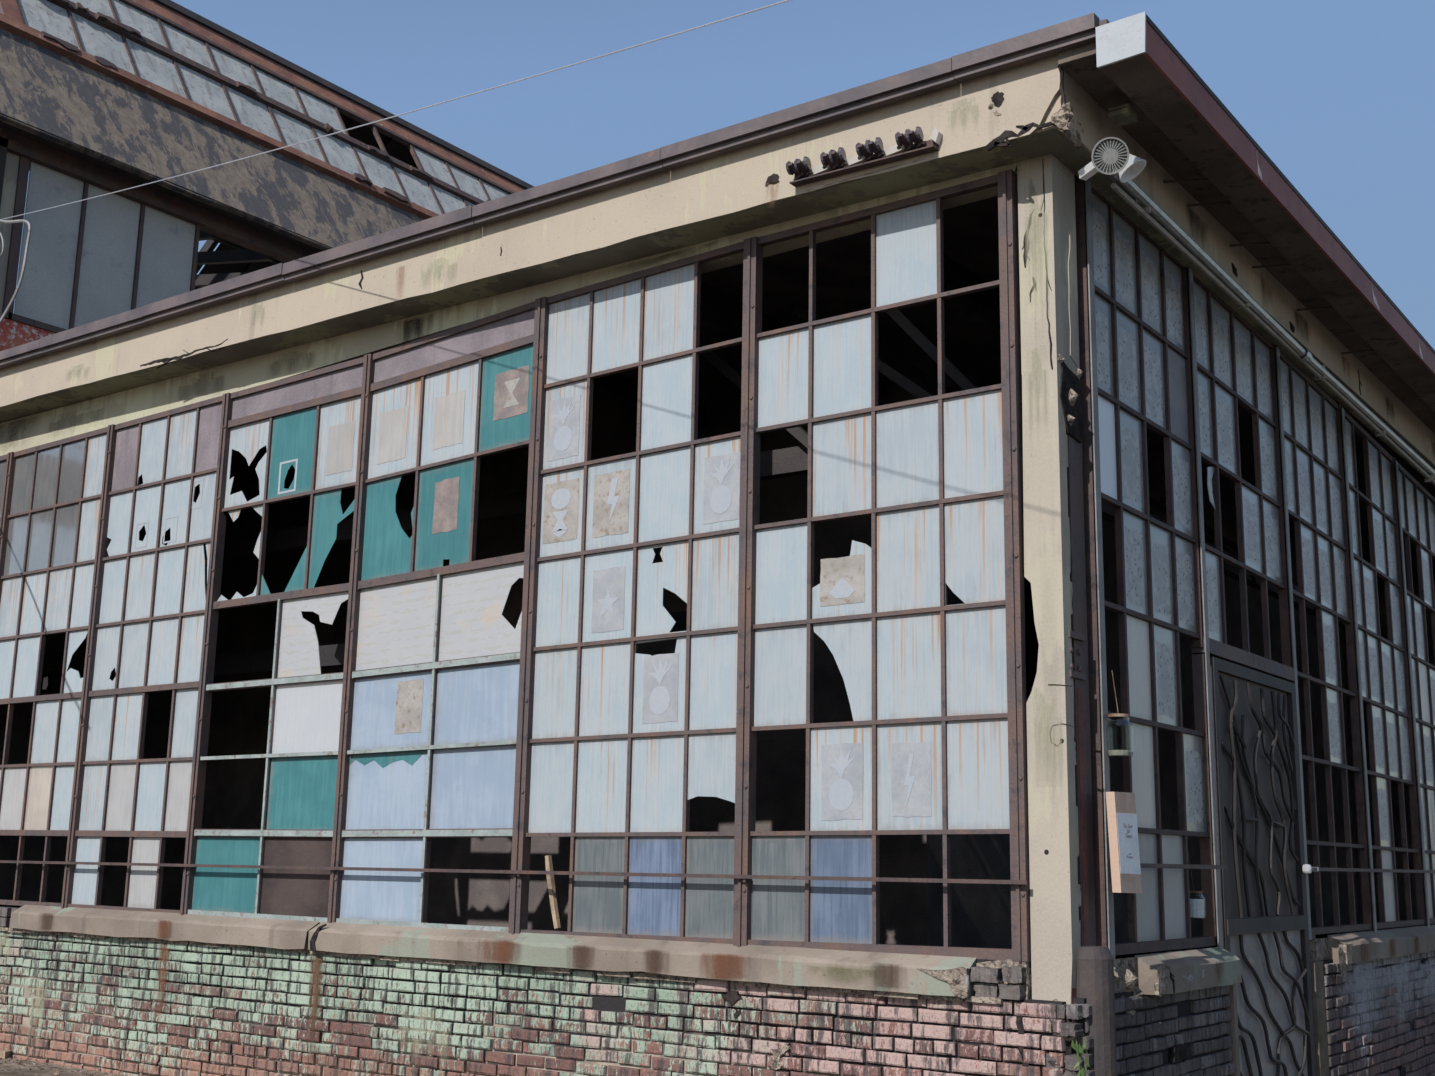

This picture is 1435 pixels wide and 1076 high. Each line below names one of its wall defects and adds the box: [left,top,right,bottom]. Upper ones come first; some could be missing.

crack [986,65,1066,369]
spalling [721,990,742,1020]